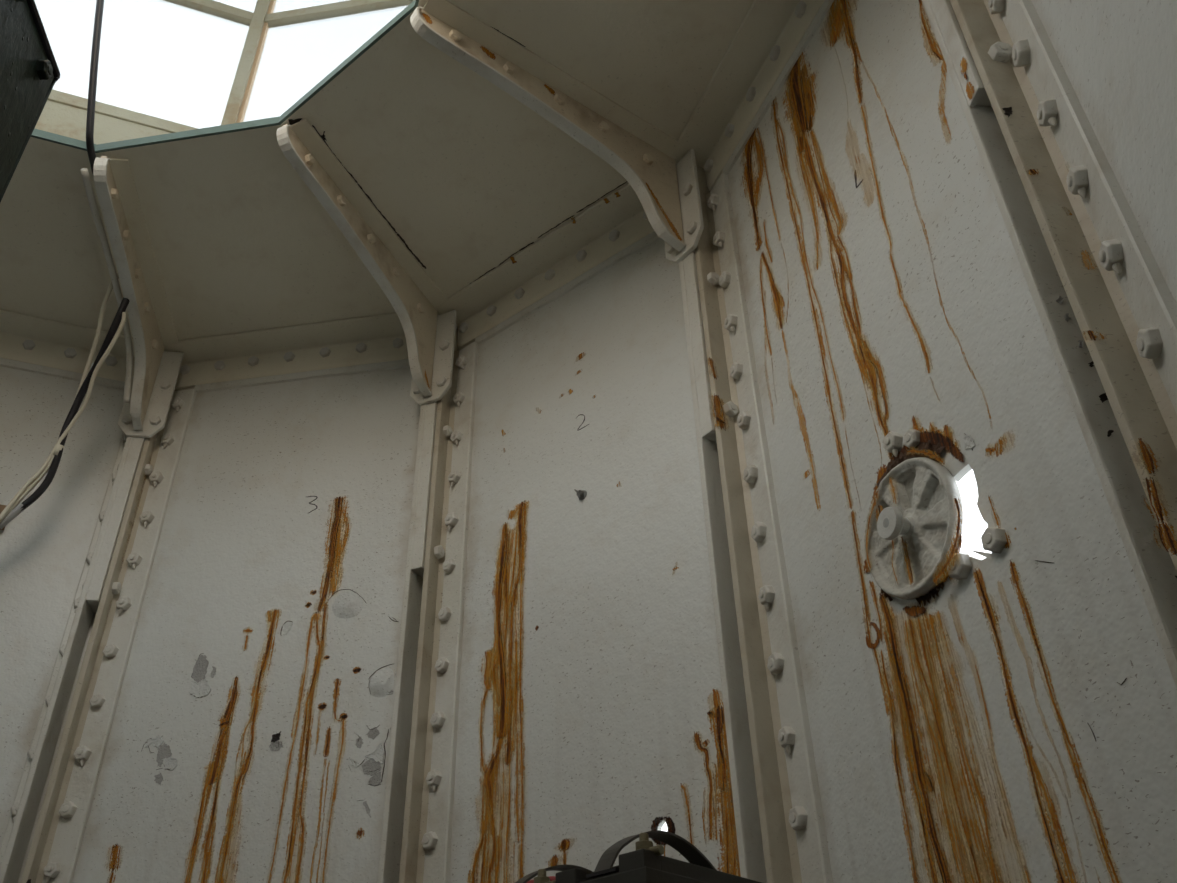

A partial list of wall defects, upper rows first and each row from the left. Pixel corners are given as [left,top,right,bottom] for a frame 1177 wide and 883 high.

corrosion [742,0,1000,883]
corrosion [1139,438,1177,555]
corrosion [106,845,120,883]
corrosion [185,609,281,883]
corrosion [268,496,349,883]
corrosion [467,500,528,883]
corrosion [681,689,741,877]
corrosion [973,569,1076,883]
corrosion [1010,562,1119,883]